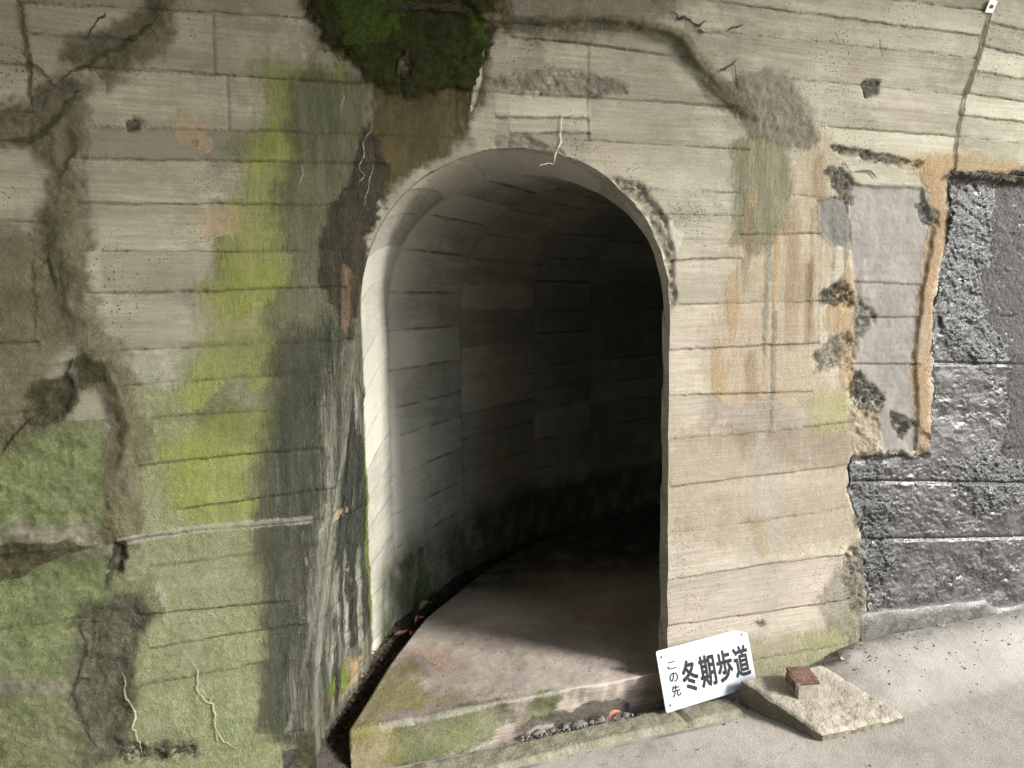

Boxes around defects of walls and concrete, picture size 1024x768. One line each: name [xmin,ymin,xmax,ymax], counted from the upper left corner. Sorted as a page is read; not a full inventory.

crack [19,0,56,111]
crack [87,12,106,38]
crack [540,113,566,166]
damp [700,68,821,149]
spalling [861,79,882,98]
crack [954,13,992,171]
damp [0,0,177,548]
rust [712,141,883,456]
rust [906,156,953,452]
damp [162,50,484,768]
spalling [813,143,1024,640]
damp [0,540,89,580]